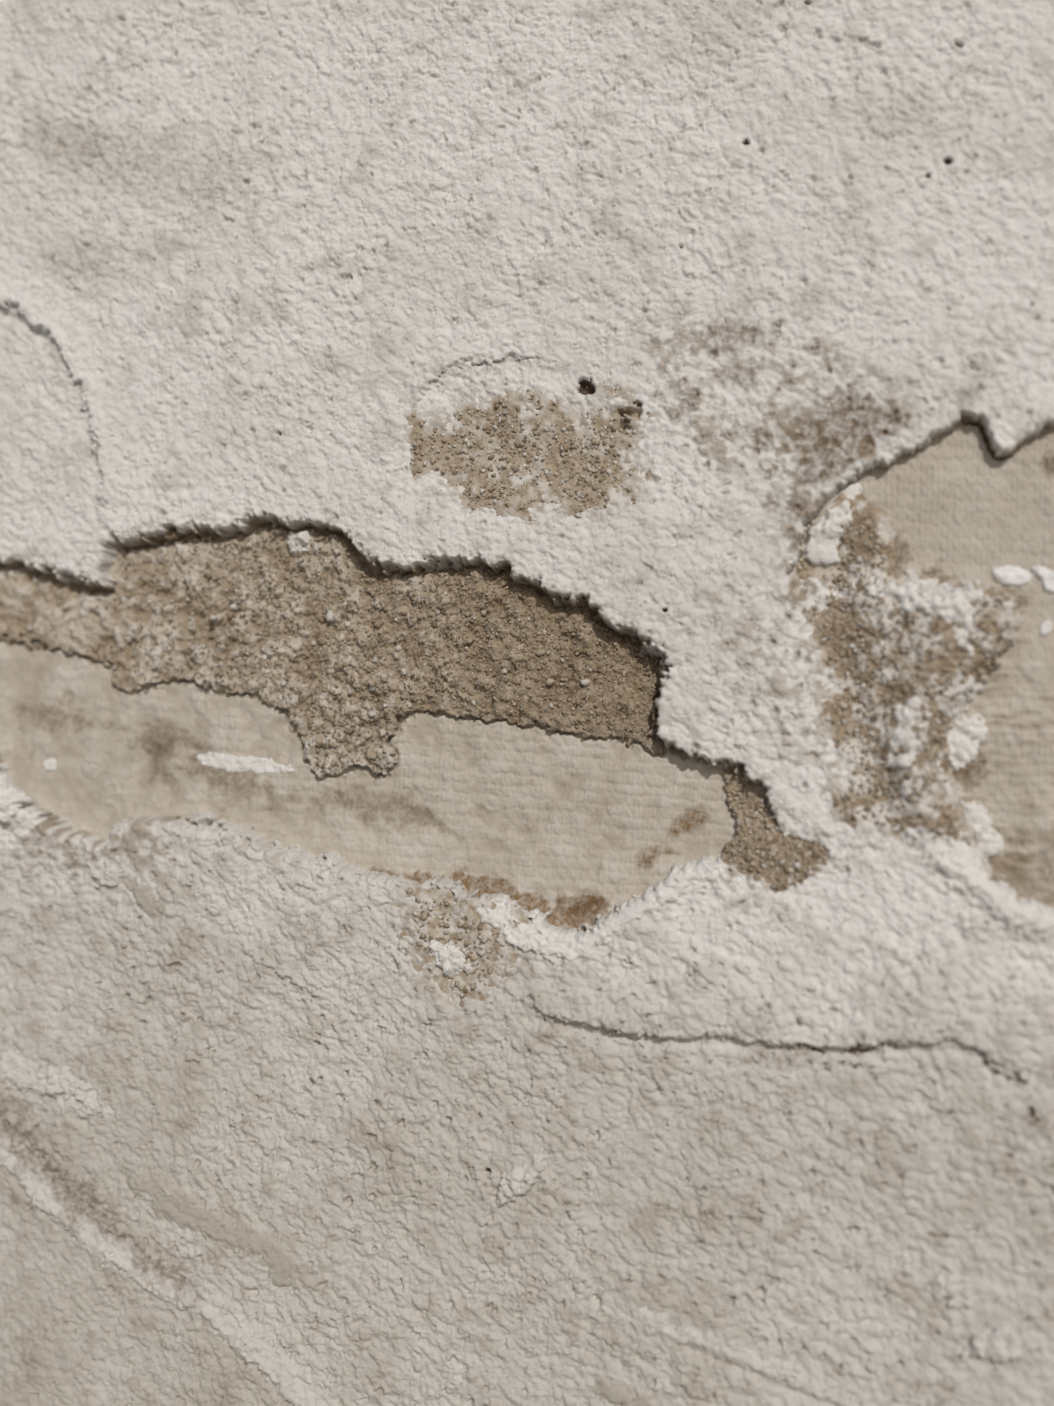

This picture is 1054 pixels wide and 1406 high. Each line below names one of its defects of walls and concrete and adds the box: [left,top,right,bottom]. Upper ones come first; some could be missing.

flaking render [0,248,830,1008]
flaking render [787,418,1054,941]
crack [760,1043,885,1077]
crack [972,1047,1047,1122]